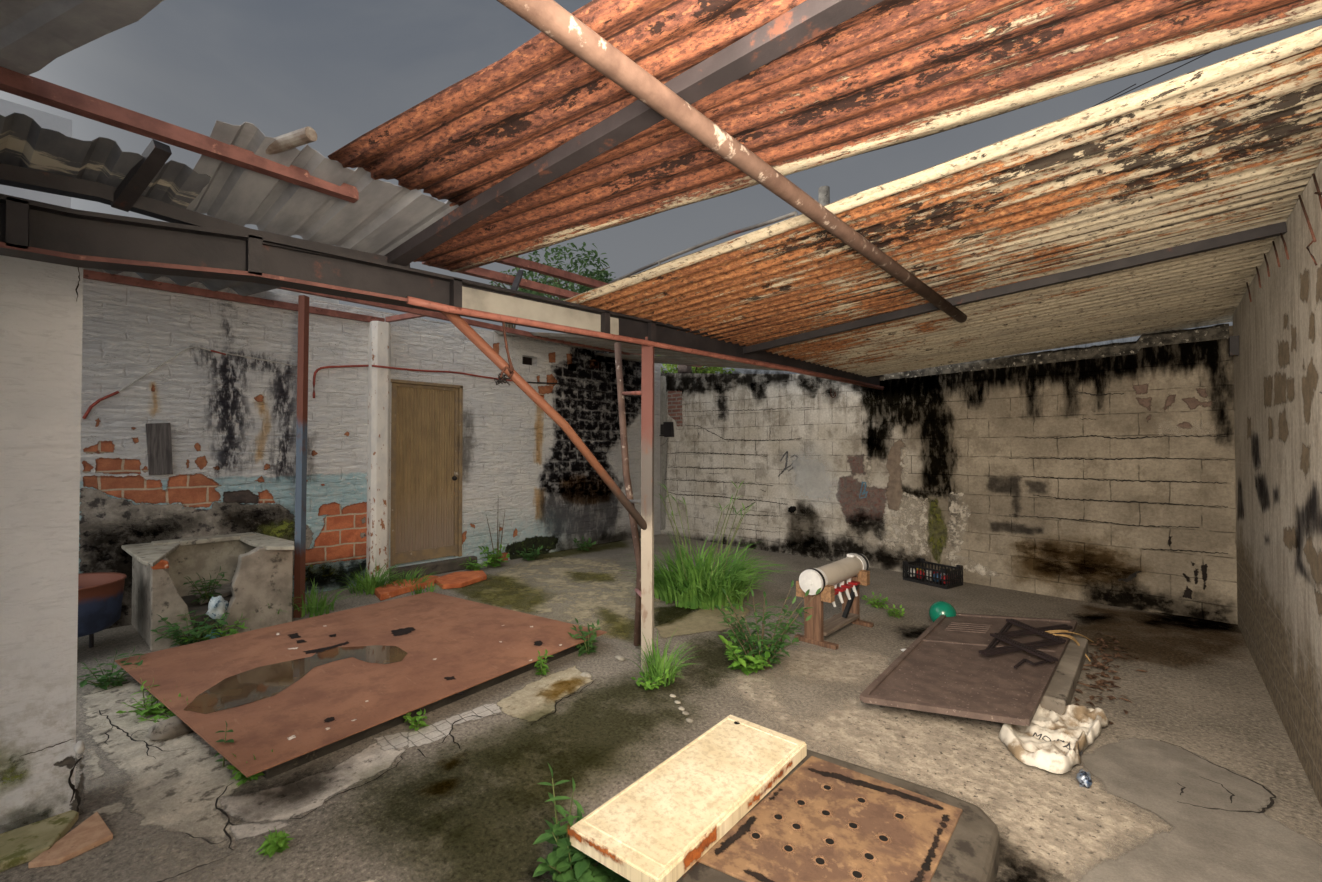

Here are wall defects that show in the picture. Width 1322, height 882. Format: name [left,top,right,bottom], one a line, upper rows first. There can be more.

damp [201,352,293,478]
damp [580,349,642,436]
damp [661,323,1234,530]
spalling [79,418,367,580]
peeling [836,439,997,576]
damp [1238,476,1278,518]
damp [901,628,926,638]
damp [1023,543,1236,630]
spalling [1283,527,1322,615]
damp [552,680,579,696]
crack [22,681,196,812]
crack [157,782,254,882]